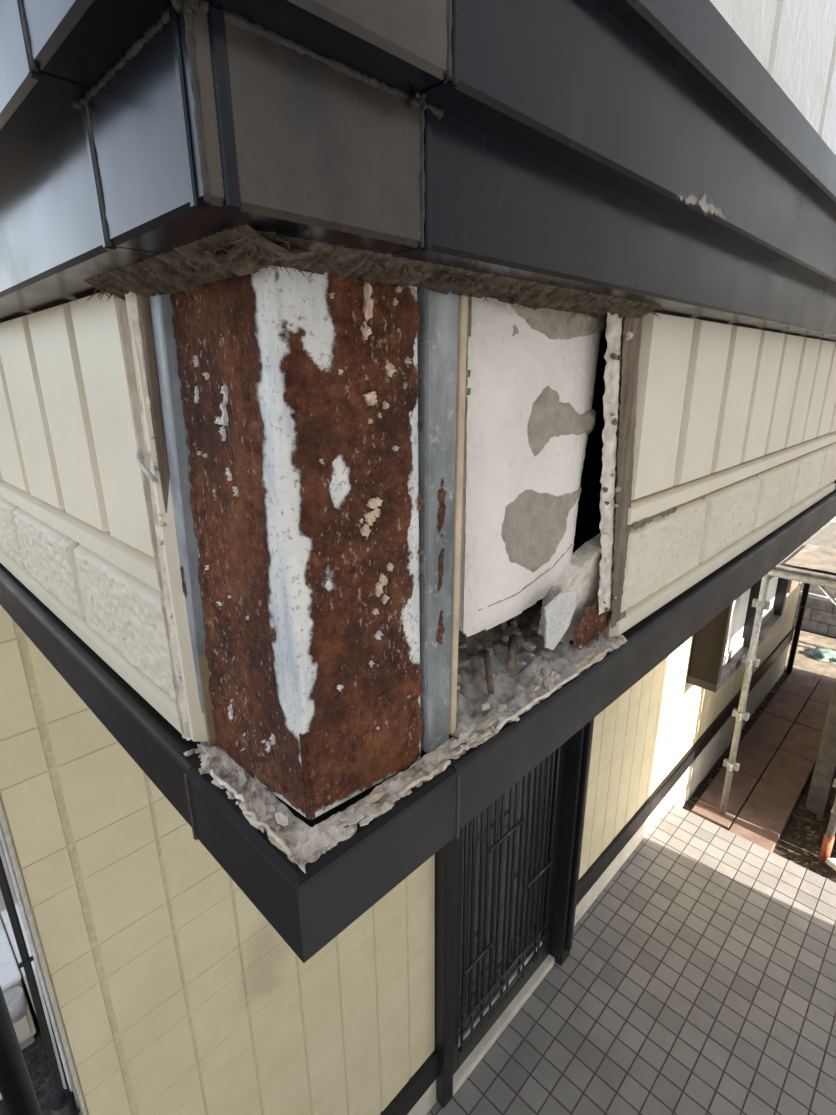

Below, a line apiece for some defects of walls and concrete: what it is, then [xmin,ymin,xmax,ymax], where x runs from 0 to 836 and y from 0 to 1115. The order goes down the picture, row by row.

peeling [360,282,373,340]
rust [170,273,424,820]
spalling [125,292,677,874]
rust [436,611,445,645]
rust [437,479,446,591]